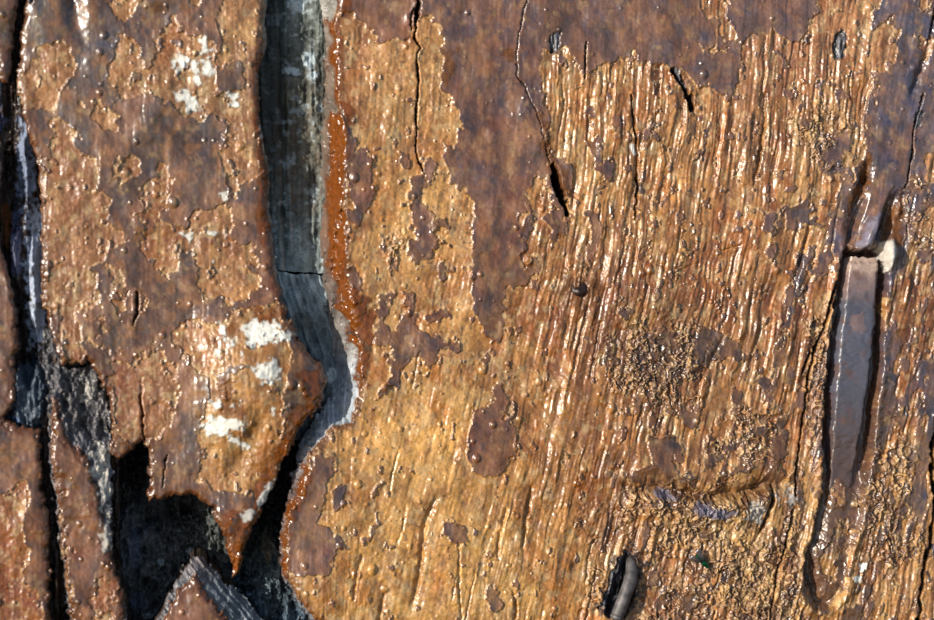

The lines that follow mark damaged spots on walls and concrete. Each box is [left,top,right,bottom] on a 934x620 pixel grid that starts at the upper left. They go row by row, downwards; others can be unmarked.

crack [409,0,425,173]
crack [515,0,550,161]
peeling [17,0,292,445]
peeling [281,0,934,620]
peeling [61,546,75,598]
peeling [194,421,280,502]
crack [757,281,837,620]
crack [915,432,934,620]